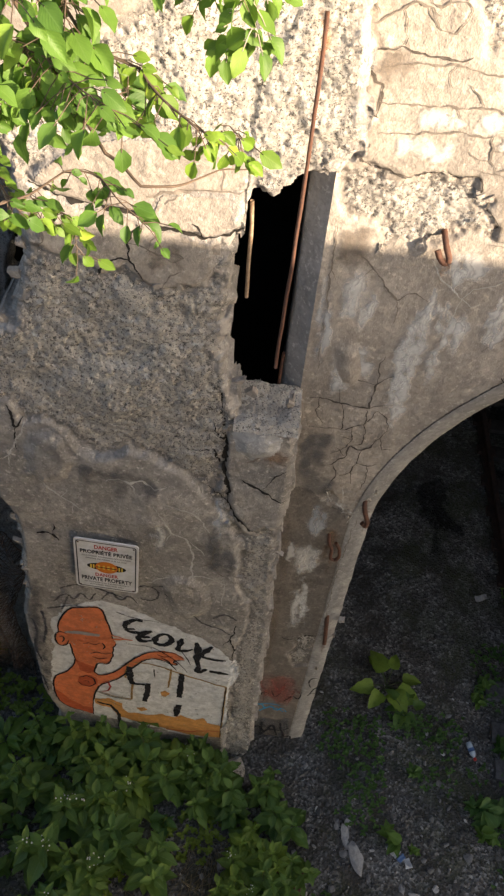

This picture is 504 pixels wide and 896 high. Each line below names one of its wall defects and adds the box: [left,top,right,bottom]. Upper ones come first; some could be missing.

spalling [0,106,62,223]
crack [28,170,250,289]
spalling [94,0,495,255]
crack [318,226,338,368]
crack [361,254,428,324]
crack [360,0,504,248]
spalling [0,228,284,755]
crack [188,393,294,532]
crack [310,357,394,521]